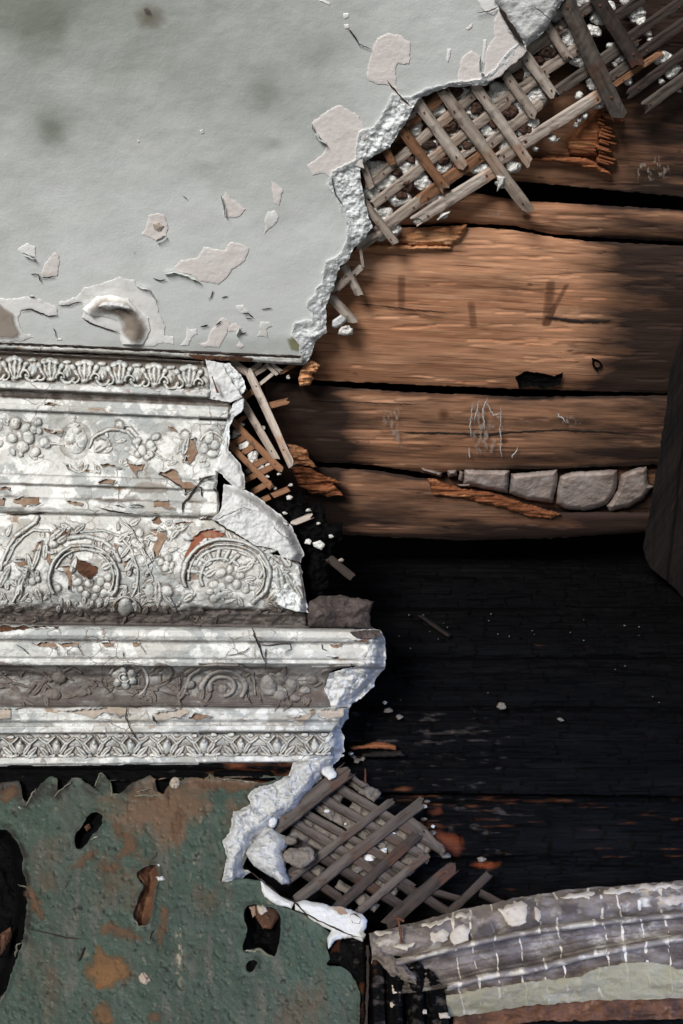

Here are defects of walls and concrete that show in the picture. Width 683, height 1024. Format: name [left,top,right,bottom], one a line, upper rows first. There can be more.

spalling [291,0,564,365]
spalling [0,242,308,613]
crack [99,474,298,564]
hole [75,812,103,849]
hole [132,864,165,940]
spalling [222,627,386,972]